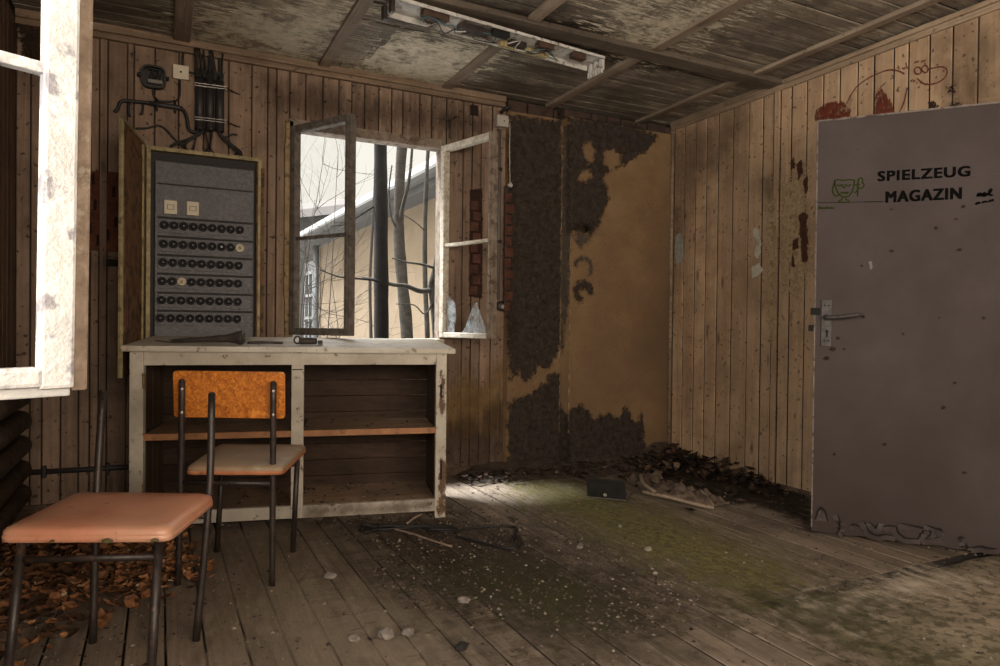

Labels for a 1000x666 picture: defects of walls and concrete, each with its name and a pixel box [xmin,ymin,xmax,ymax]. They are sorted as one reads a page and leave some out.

spalling [503,186,514,312]
peeling [811,506,946,545]